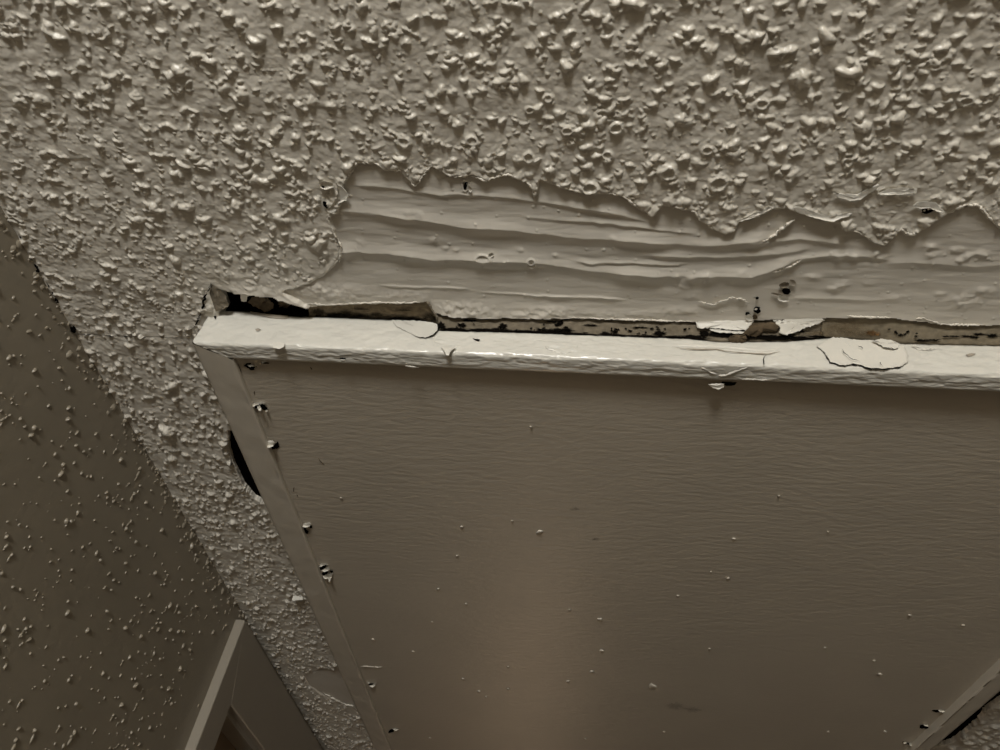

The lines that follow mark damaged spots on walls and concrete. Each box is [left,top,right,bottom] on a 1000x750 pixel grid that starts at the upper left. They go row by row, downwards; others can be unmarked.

peeling [319,181,349,214]
peeling [794,206,852,222]
peeling [834,184,945,213]
spalling [771,279,796,302]
peeling [392,320,438,338]
leakage [310,308,831,341]
crack [194,283,1000,381]
peeling [696,297,761,334]
peeling [773,318,825,335]
peeling [817,337,935,369]
crack [228,431,261,498]